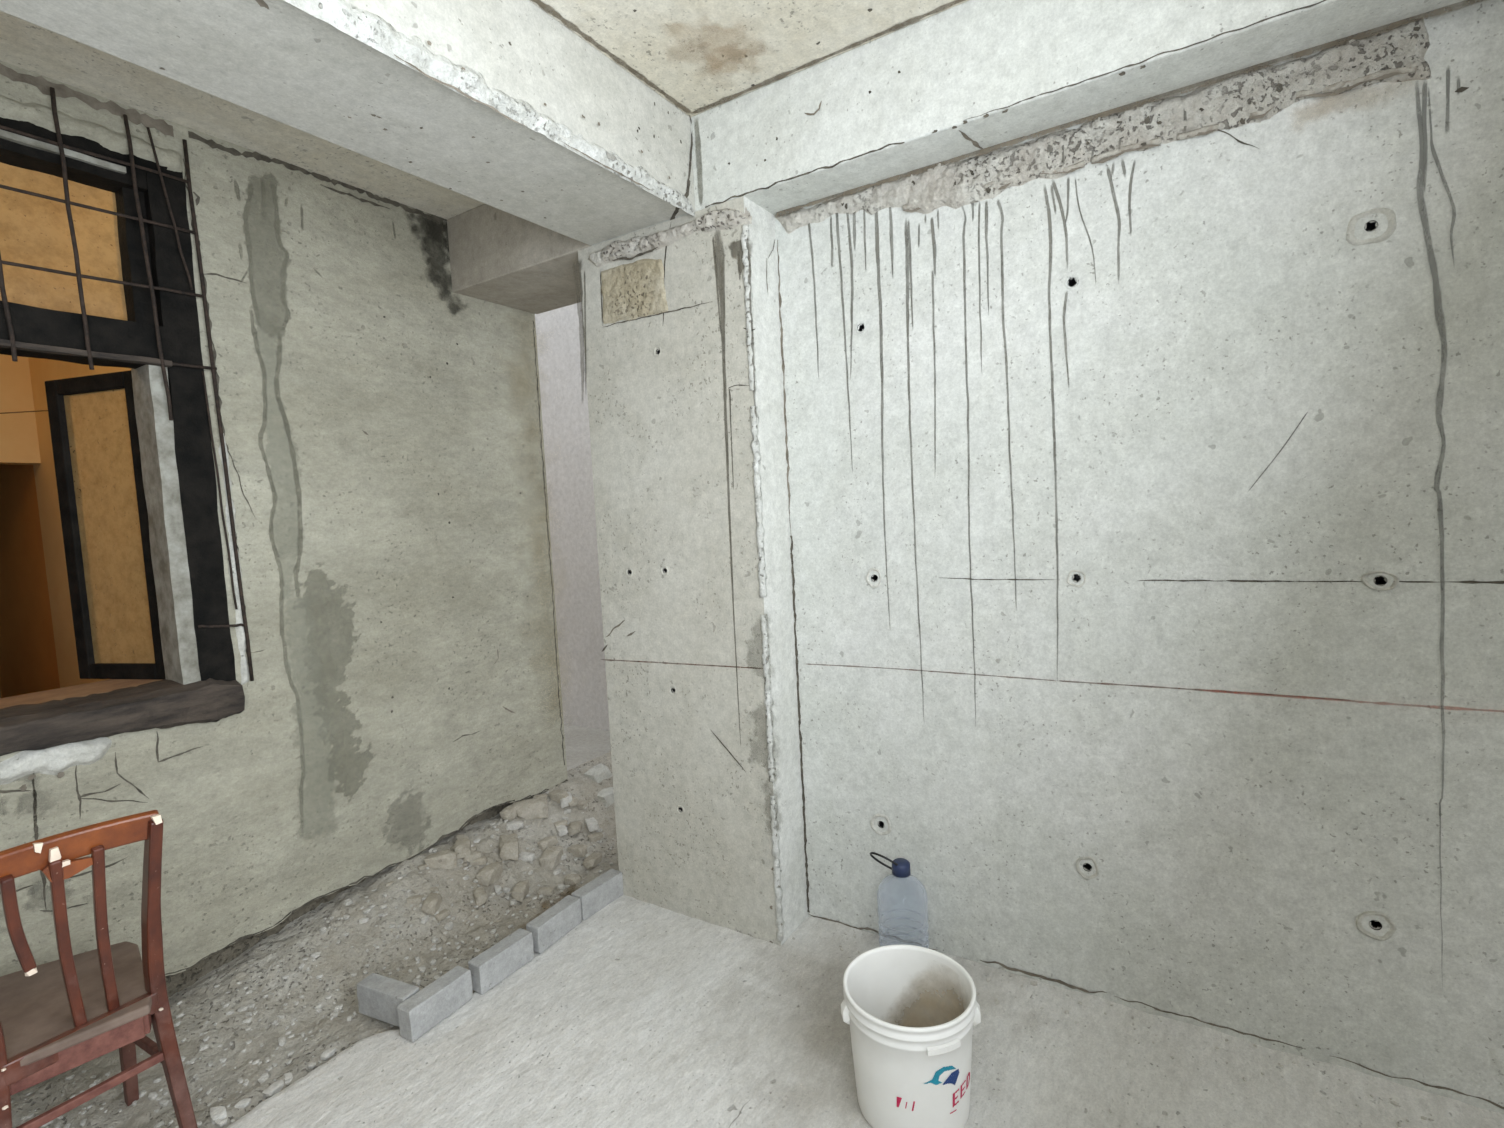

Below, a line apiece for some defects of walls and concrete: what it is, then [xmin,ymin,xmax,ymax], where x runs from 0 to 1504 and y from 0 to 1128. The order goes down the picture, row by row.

flaking render [0,95,183,172]
damp [1107,138,1135,278]
spalling [932,0,1326,149]
flaking render [219,433,249,685]
damp [235,175,372,833]
damp [808,207,939,692]
damp [962,201,1016,714]
damp [1044,134,1096,662]
flaking render [0,737,112,791]
crack [0,773,129,912]
crack [75,733,203,817]
flaking render [165,779,568,975]